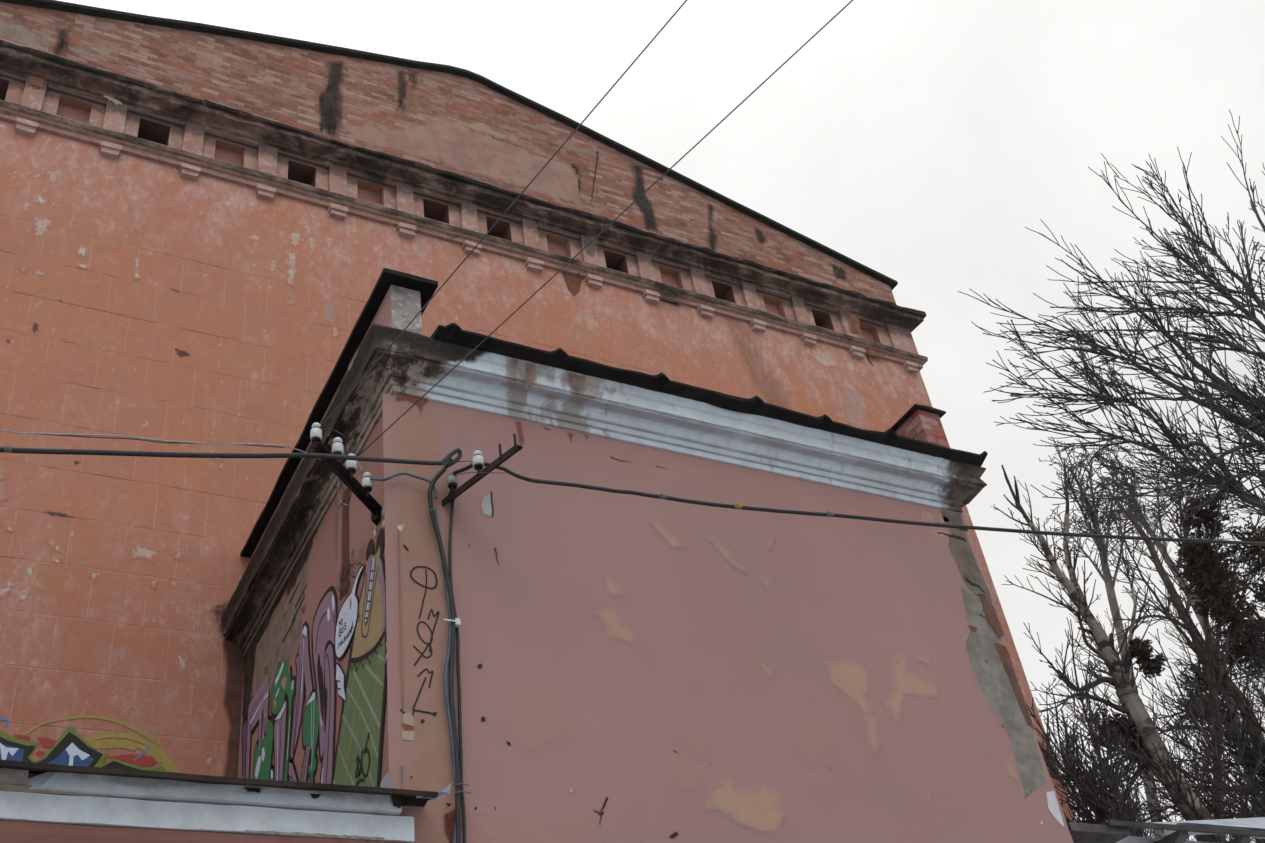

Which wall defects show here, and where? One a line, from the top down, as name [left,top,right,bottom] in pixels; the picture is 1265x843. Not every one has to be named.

flaking render [252,552,311,708]
flaking render [382,393,1067,843]